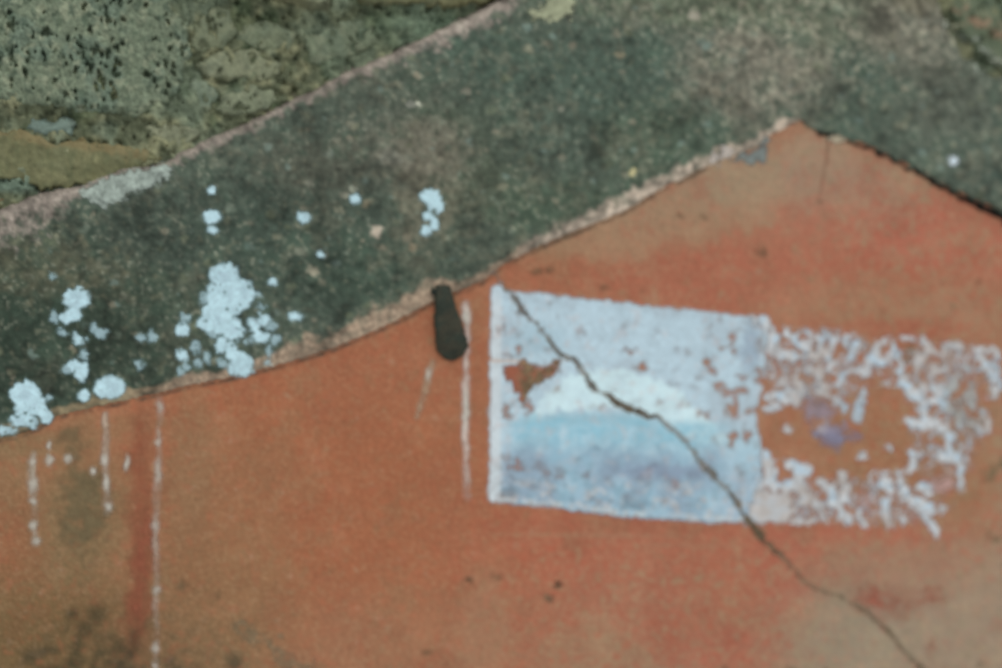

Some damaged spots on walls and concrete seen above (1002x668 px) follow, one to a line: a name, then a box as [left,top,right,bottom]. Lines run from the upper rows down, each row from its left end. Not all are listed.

water stain [29,442,53,504]
water stain [64,412,111,542]
peeling [505,360,559,402]
crack [494,273,922,668]
peeling [744,315,1002,538]